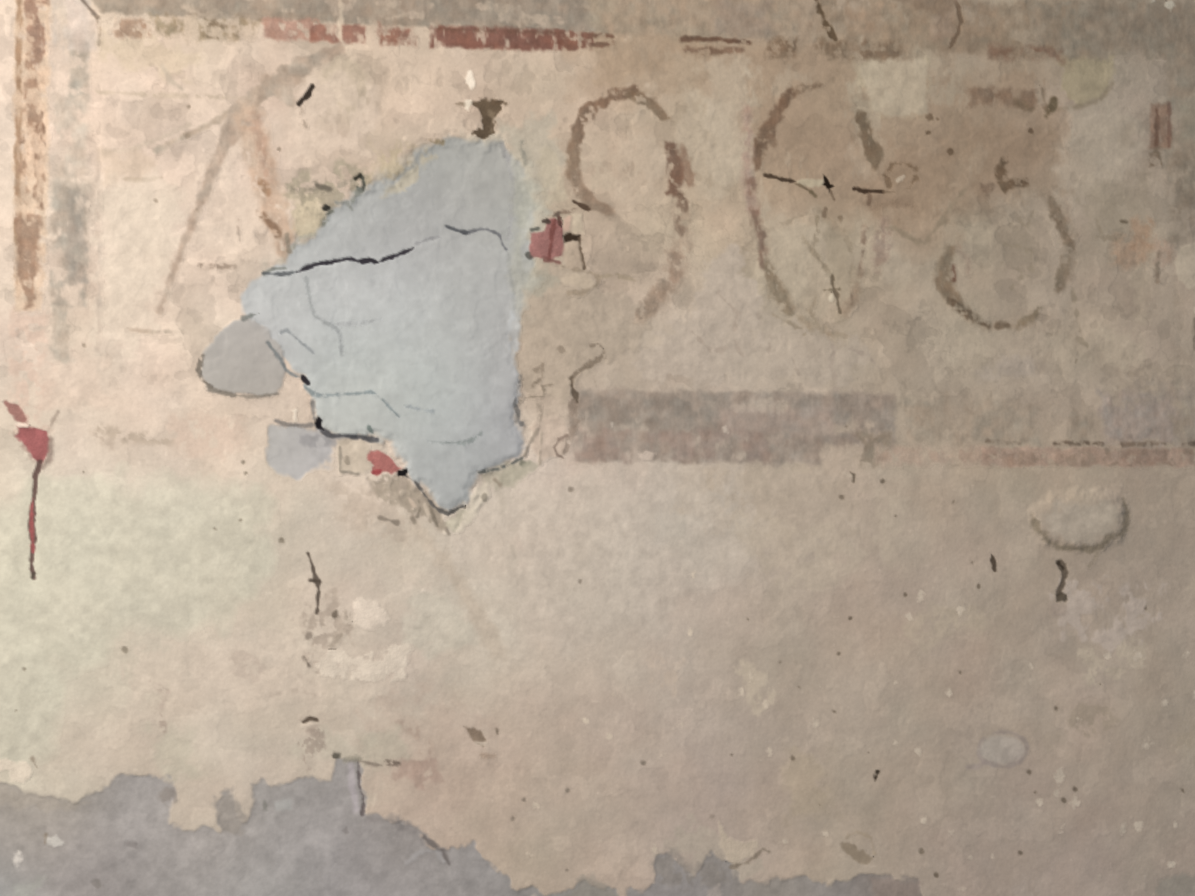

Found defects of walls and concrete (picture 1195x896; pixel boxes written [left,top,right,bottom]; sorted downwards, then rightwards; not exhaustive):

flaking render [194,132,570,536]
crack [261,224,509,448]
flaking render [2,399,61,472]
crack [396,467,466,517]
crack [301,550,353,669]
peeling [0,755,941,896]